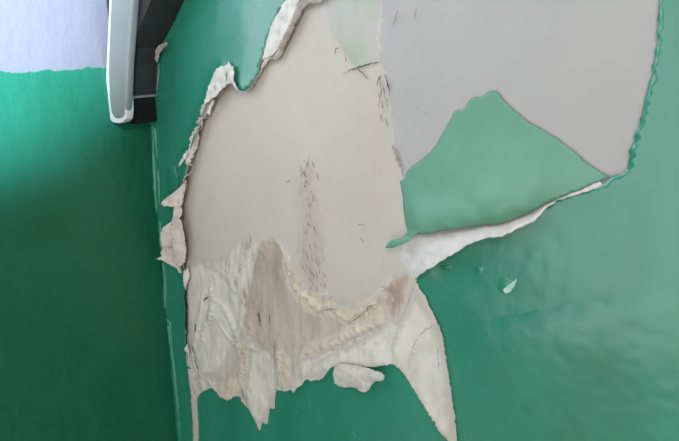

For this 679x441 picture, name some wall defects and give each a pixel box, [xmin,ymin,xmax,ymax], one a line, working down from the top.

peeling [155,42,167,88]
peeling [157,0,660,441]